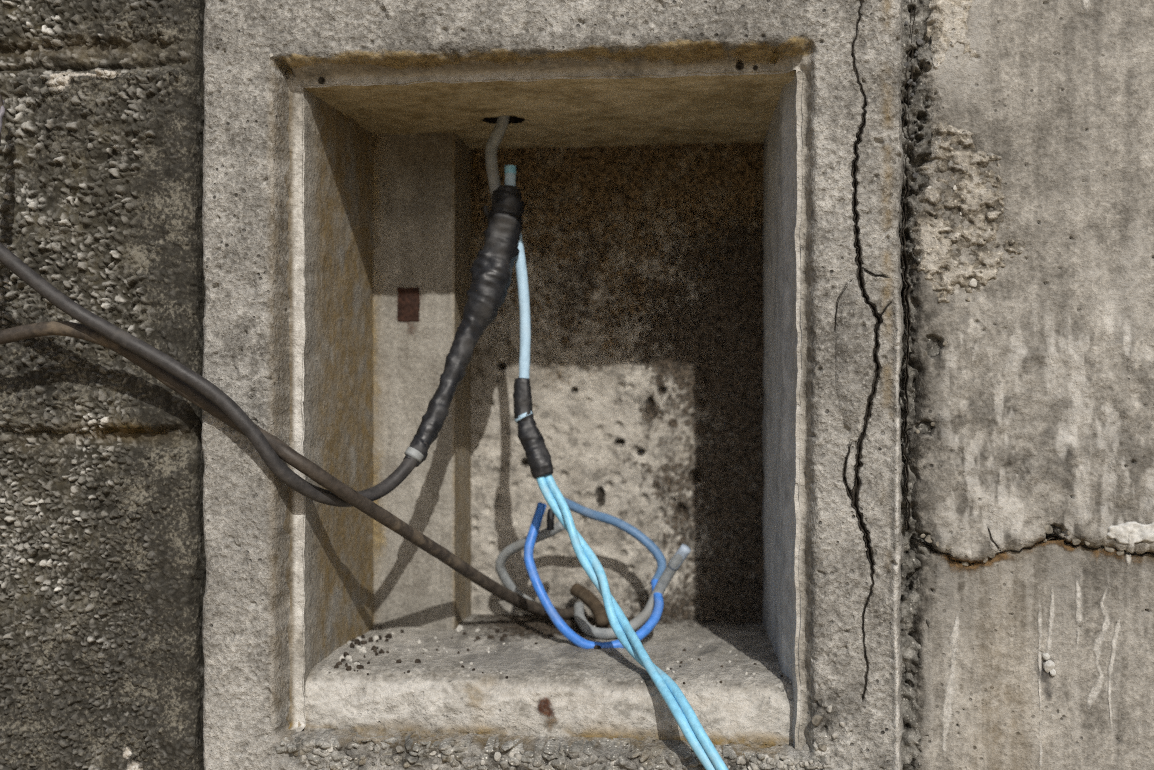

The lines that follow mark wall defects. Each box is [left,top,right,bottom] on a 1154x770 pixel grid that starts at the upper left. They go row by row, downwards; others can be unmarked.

water stain [470,143,764,623]
crack [835,0,891,701]
spalling [908,122,1026,303]
crack [911,525,1154,566]